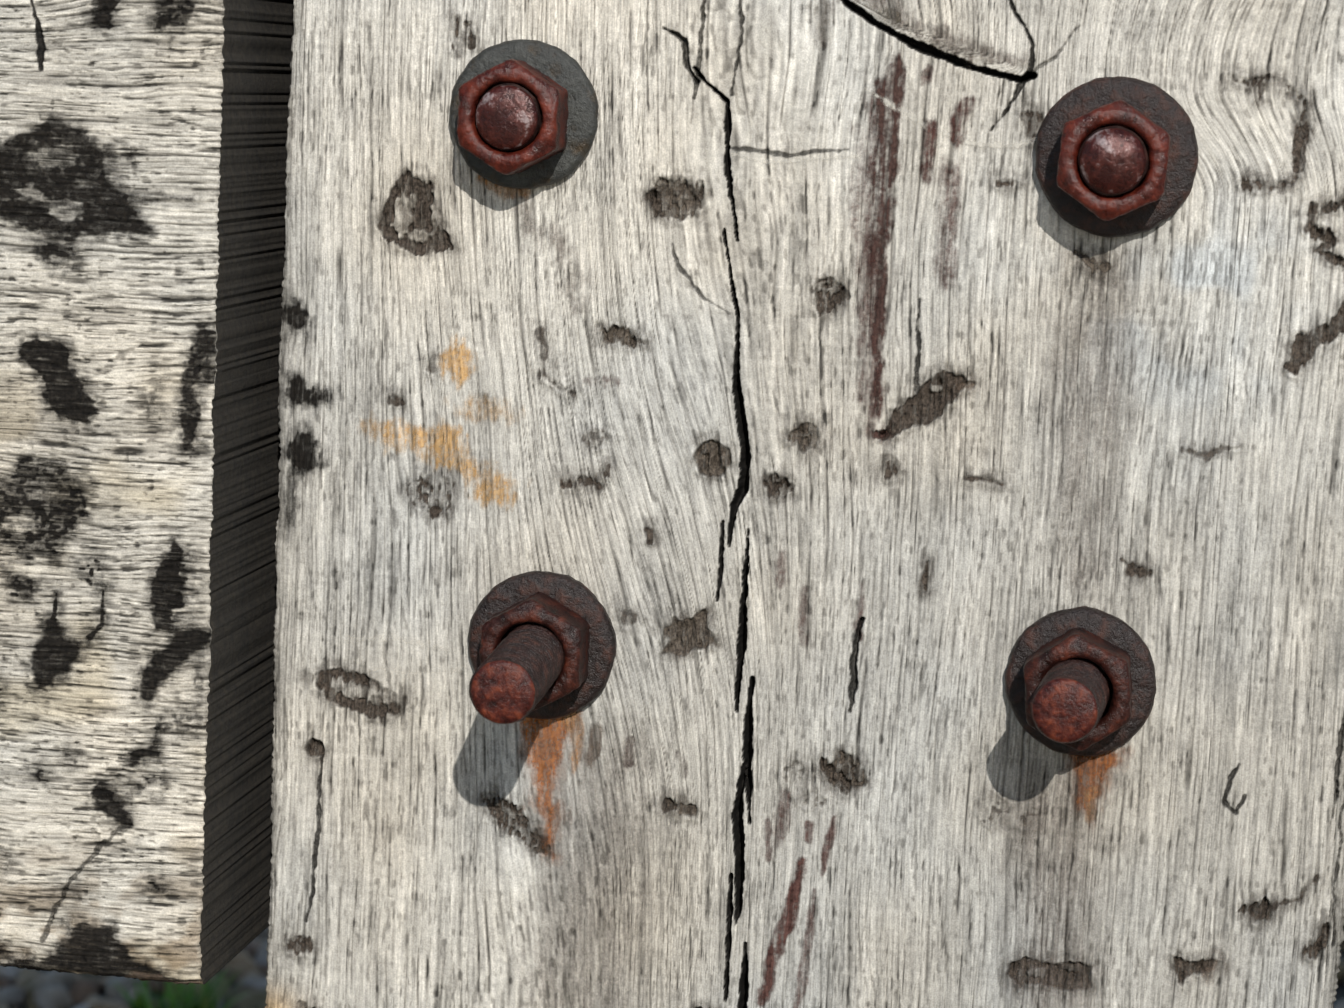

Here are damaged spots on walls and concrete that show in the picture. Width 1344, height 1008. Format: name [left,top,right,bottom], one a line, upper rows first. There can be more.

crack [841,0,1071,131]
crack [913,299,921,391]
crack [663,0,841,1008]
crack [848,617,865,712]
rust [521,712,583,859]
rust [1070,751,1117,815]